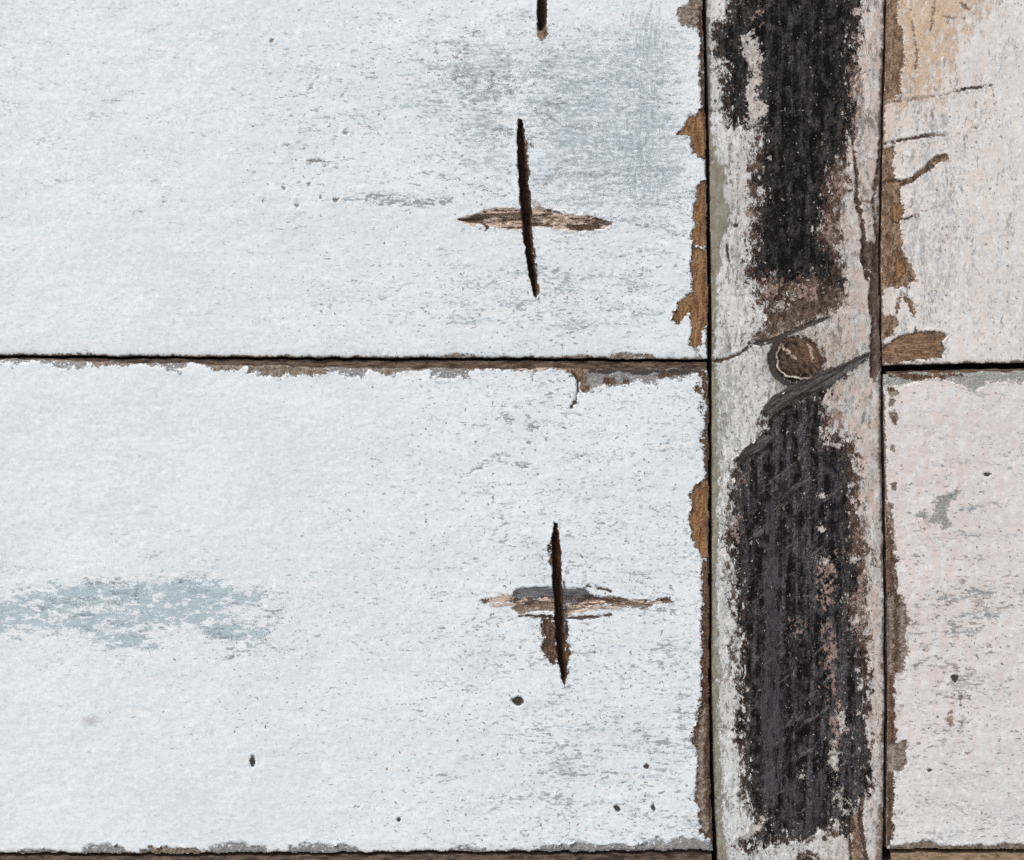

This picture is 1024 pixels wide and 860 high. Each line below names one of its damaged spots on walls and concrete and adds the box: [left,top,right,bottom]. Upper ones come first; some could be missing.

crack [536,0,549,41]
peeling [884,0,907,101]
crack [455,118,613,297]
peeling [675,0,870,346]
peeling [0,358,130,370]
peeling [150,362,188,374]
peeling [207,365,411,381]
peeling [428,352,472,379]
peeling [533,146,1024,860]
crack [479,522,674,688]